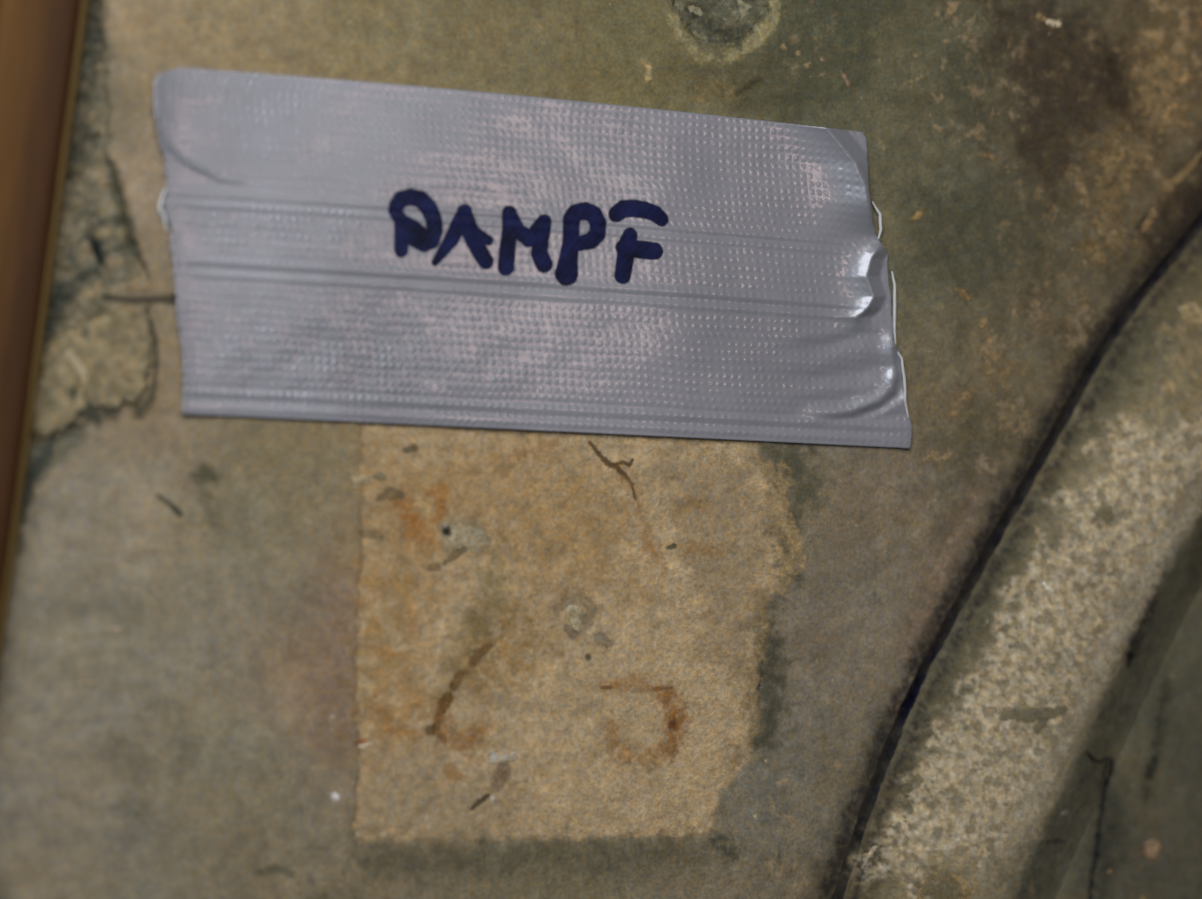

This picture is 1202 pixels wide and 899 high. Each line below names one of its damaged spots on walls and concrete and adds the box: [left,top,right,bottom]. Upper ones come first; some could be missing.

spalling [43,0,148,348]
rust [611,677,685,763]